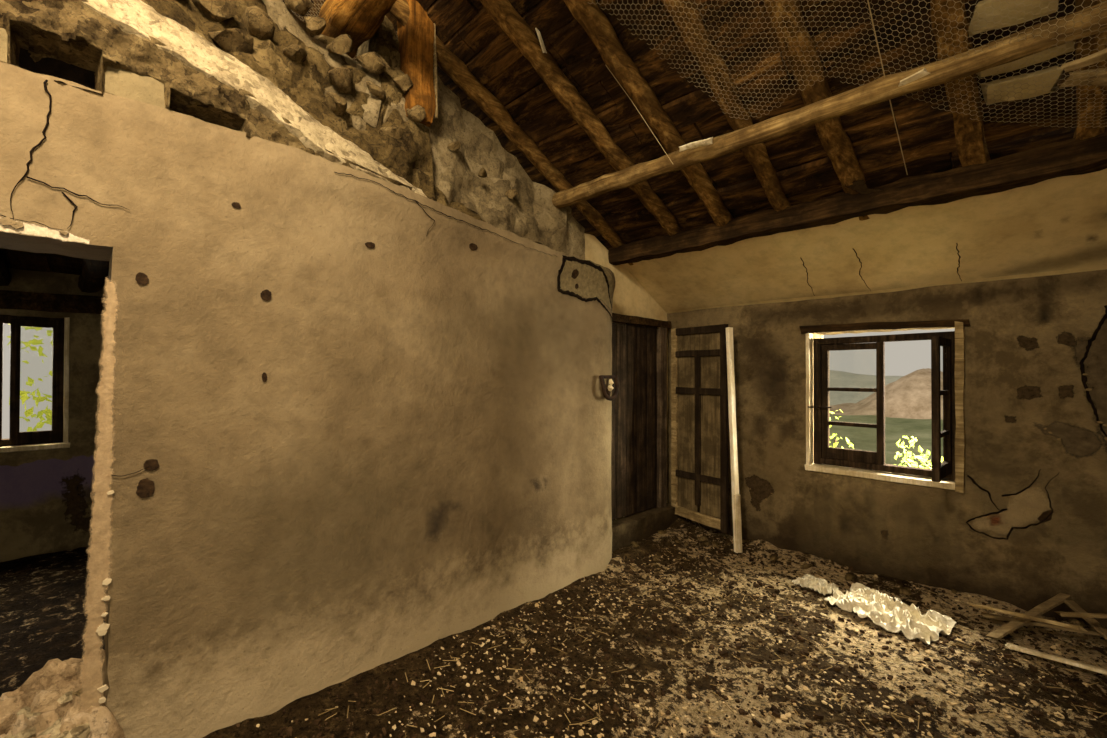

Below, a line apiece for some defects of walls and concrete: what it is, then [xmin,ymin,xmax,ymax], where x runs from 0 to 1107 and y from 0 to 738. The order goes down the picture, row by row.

crack [0,80,129,230]
spalling [1017,335,1039,351]
peeling [1035,305,1107,458]
spalling [1017,385,1043,400]
spalling [1037,510,1053,523]